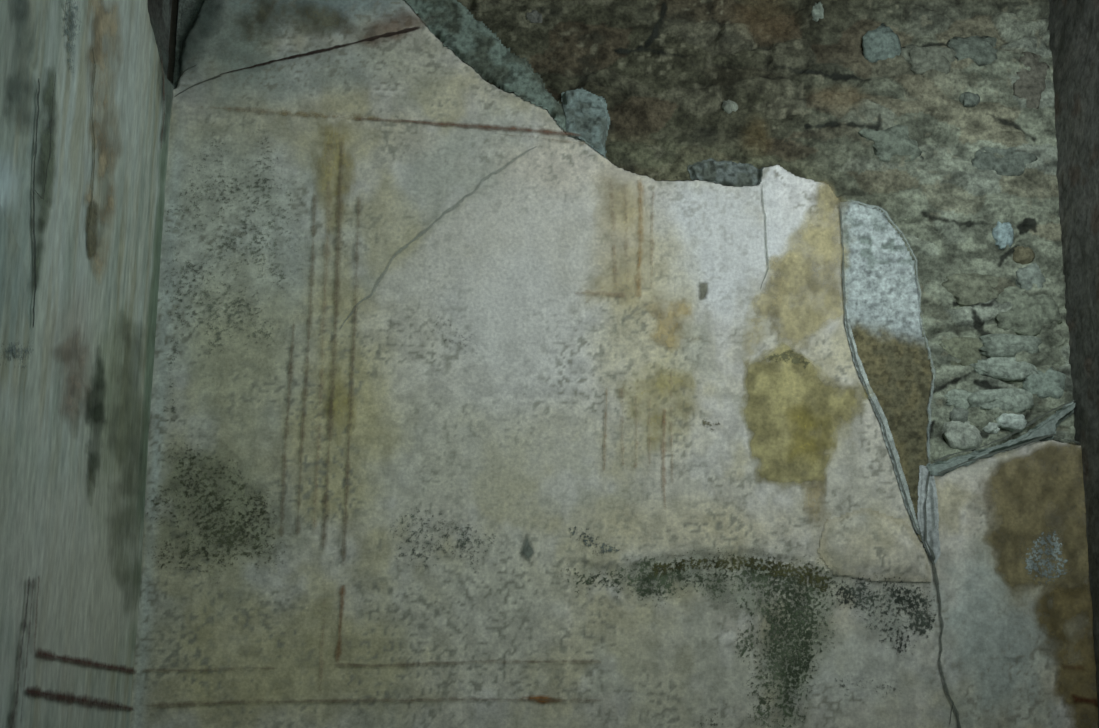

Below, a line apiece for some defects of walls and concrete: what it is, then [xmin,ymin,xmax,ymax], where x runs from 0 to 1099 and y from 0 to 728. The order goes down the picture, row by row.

flaking render [147,0,222,101]
crack [160,15,420,148]
crack [341,147,535,328]
flaking render [404,0,1075,546]
damp [146,448,276,572]
crack [839,207,1079,728]
damp [561,526,936,727]